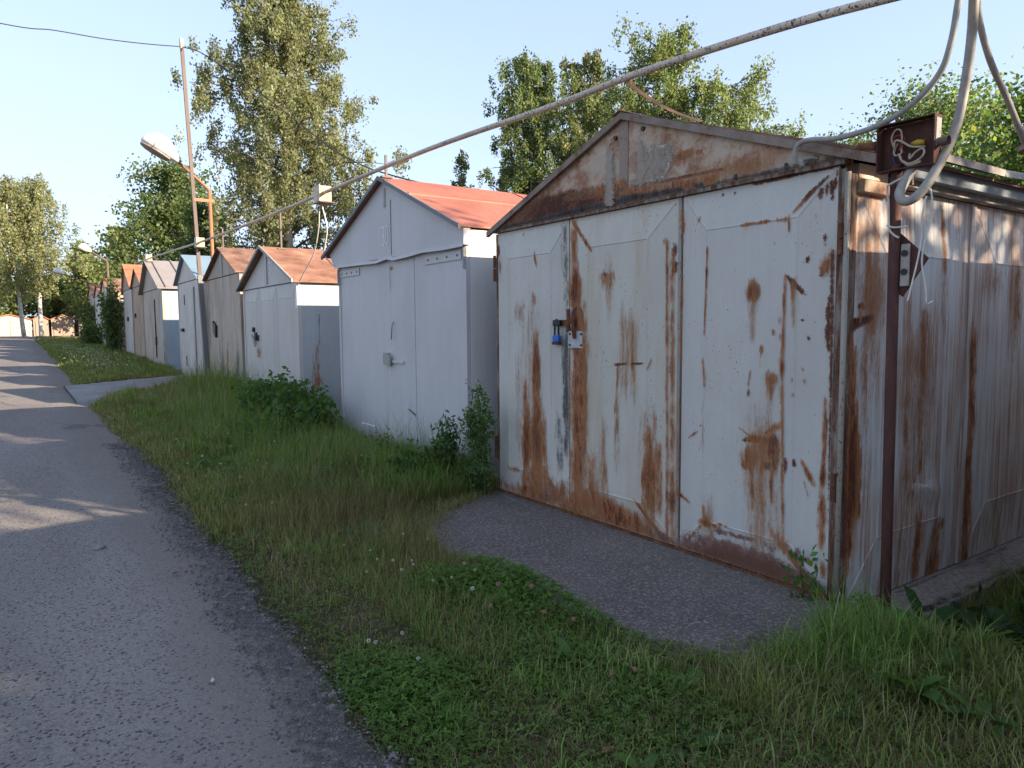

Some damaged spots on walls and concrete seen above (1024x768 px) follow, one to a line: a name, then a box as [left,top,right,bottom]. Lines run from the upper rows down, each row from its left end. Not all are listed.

corrosion [500,148,774,548]
corrosion [740,215,790,232]
corrosion [739,233,835,596]
corrosion [842,195,884,577]
corrosion [990,212,1022,342]